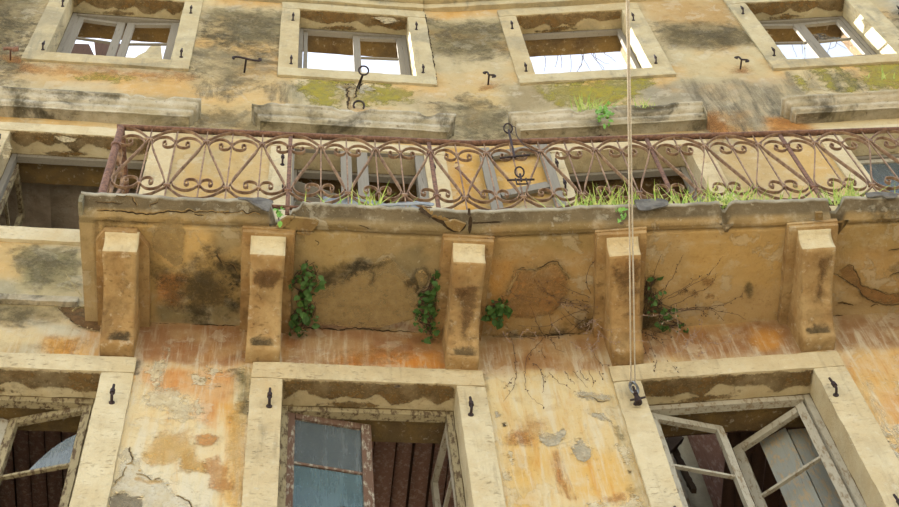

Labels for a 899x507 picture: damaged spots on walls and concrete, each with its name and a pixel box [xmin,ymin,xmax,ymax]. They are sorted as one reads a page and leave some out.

damp [180,252,241,322]
crack [518,261,568,277]
crack [833,248,899,316]
peeling [142,359,205,422]
flaking render [107,436,233,507]
peeling [193,433,219,447]
flaking render [538,428,594,462]